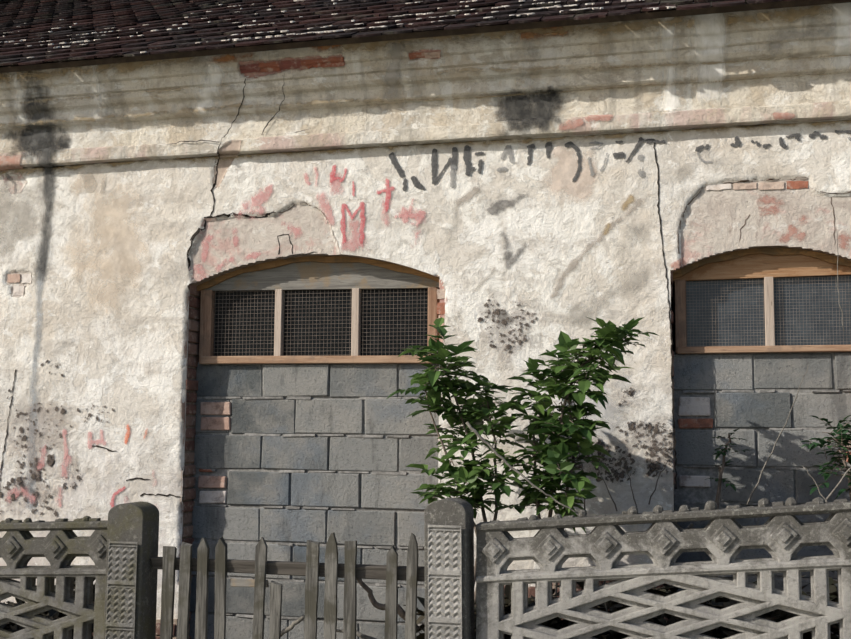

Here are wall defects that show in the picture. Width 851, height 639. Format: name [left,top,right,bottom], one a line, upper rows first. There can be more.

spalling [239,55,345,78]
damp [423,67,628,145]
damp [270,1,851,110]
damp [0,57,193,304]
crack [167,78,332,271]
peeling [187,202,340,311]
peeling [671,176,851,270]
crack [723,176,806,184]
damp [478,297,537,353]
crack [653,143,703,489]
crack [0,369,16,481]
damp [0,389,72,516]